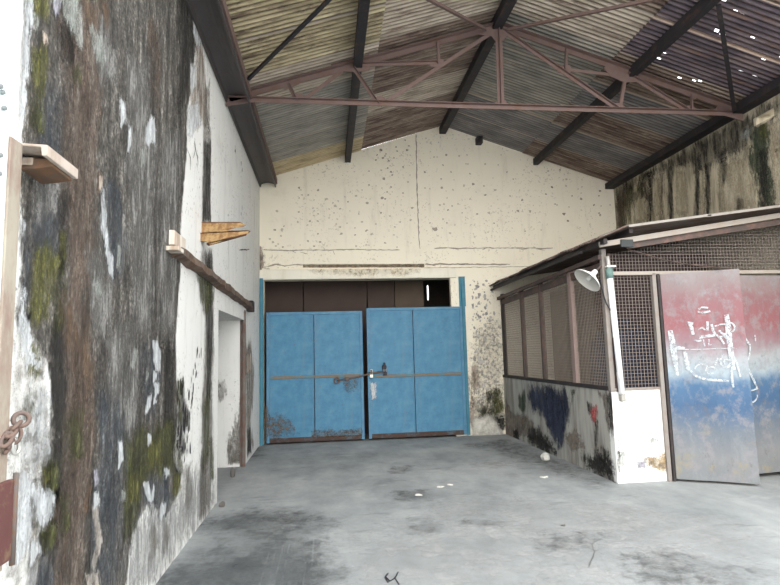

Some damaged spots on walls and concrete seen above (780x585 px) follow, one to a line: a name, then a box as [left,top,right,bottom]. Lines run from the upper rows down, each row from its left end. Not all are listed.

water stain [616,101,779,227]
water stain [7,0,329,585]
peeling [145,340,161,413]
water stain [473,319,534,437]
peeling [143,482,154,502]
corrosion [264,407,295,440]
water stain [566,429,626,482]